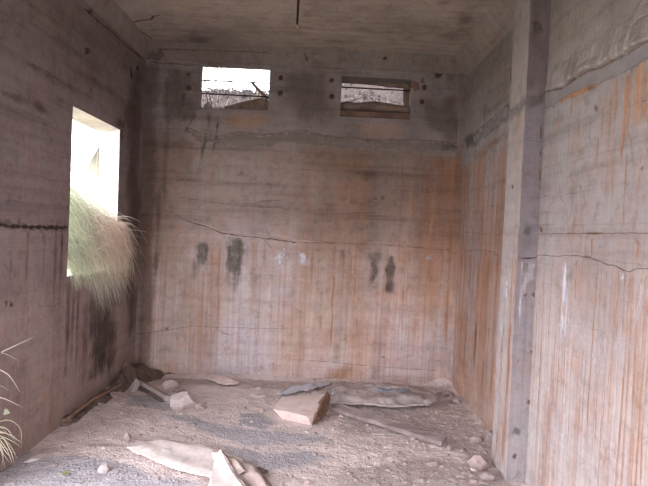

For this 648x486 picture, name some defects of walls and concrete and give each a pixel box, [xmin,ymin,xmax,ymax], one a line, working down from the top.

crack [0,222,68,230]
crack [185,220,316,243]
water stain [386,257,395,291]
crack [519,255,648,272]